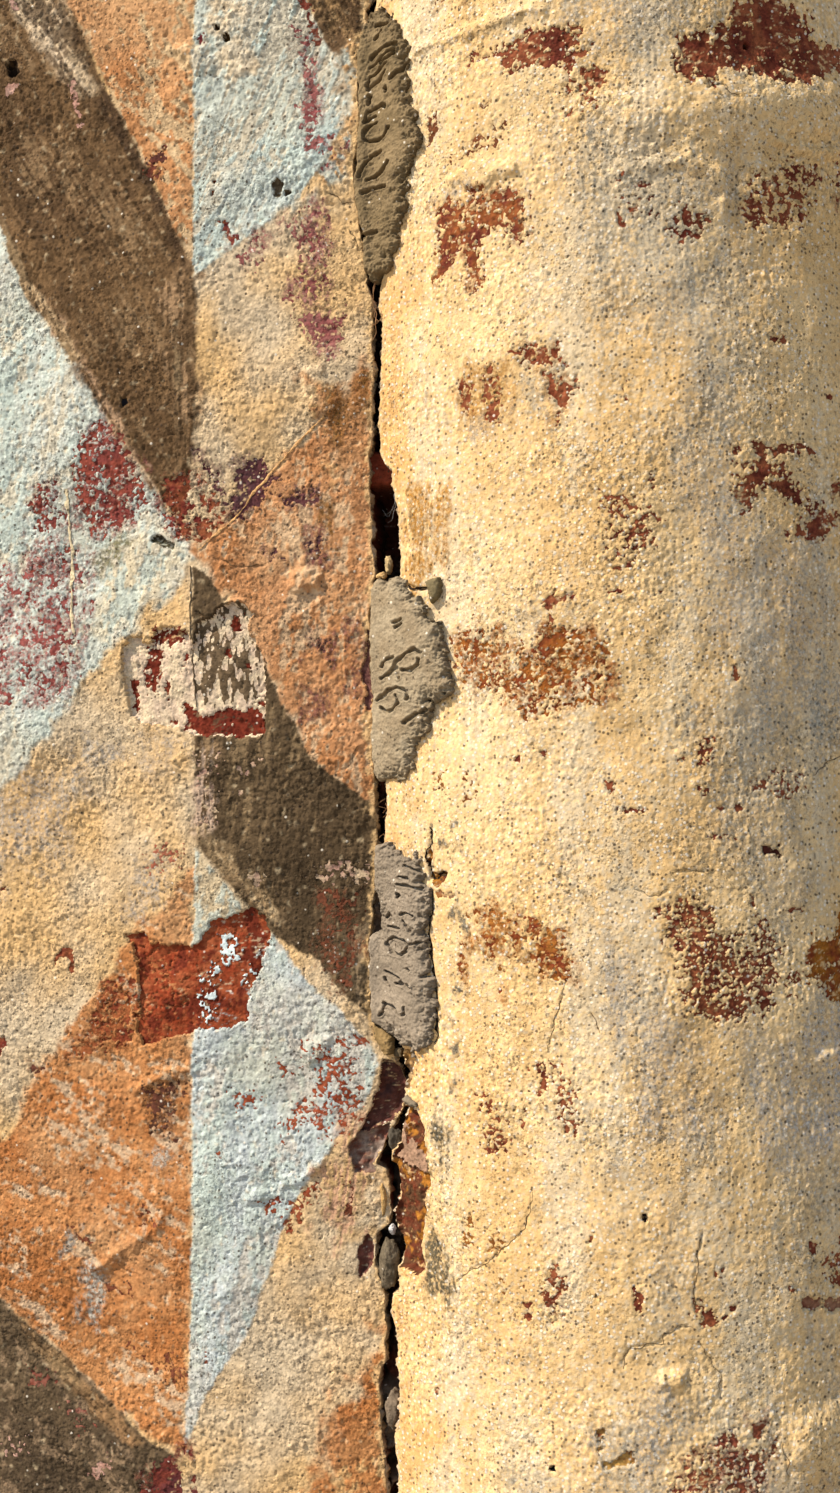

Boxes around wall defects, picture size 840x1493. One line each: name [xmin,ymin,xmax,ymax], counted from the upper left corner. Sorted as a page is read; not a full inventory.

crack [370,283,427,590]
crack [350,745,387,844]
peeling [226,1087,263,1113]
spalling [274,1034,431,1277]
crack [367,827,445,1493]
peeling [126,1341,188,1391]